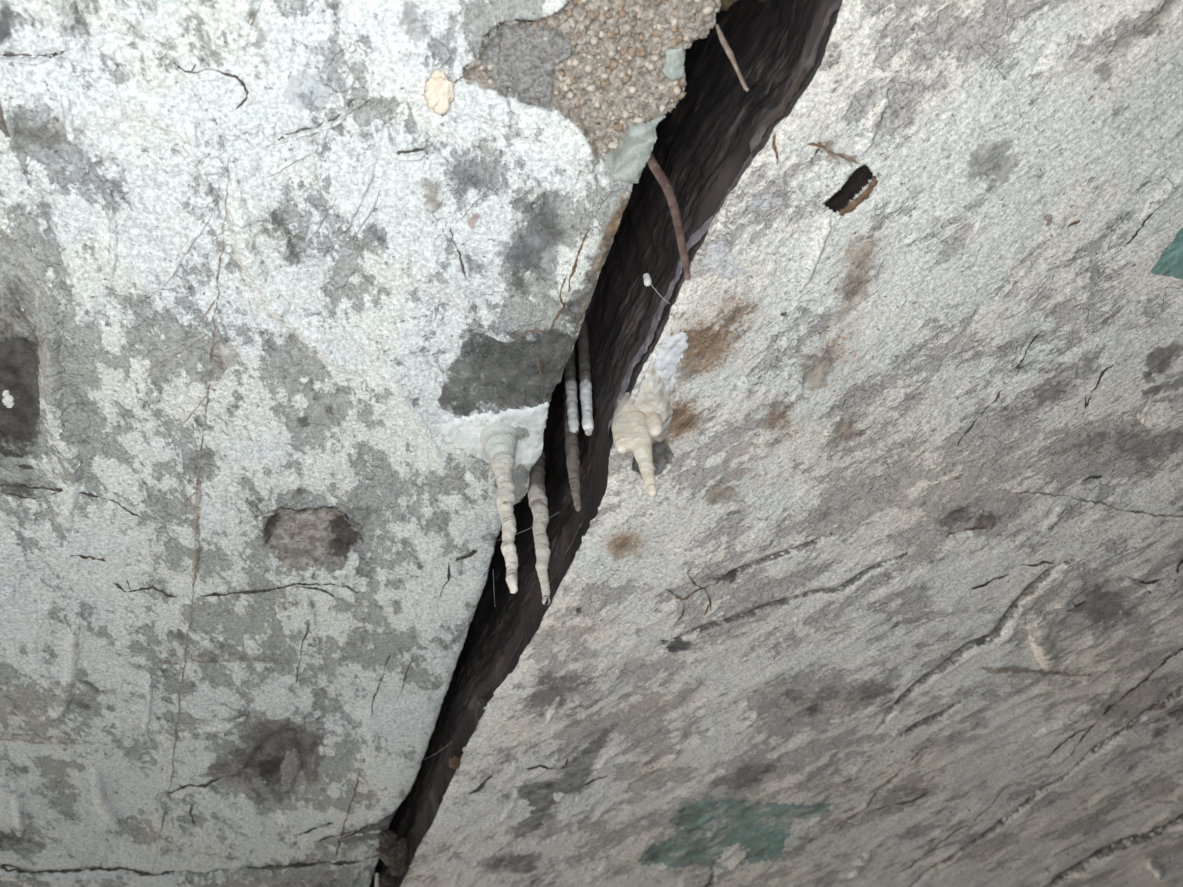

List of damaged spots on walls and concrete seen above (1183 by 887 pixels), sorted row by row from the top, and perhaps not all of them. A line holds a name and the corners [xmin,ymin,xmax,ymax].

spalling [463,0,721,183]
crack [771,133,779,164]
crack [807,142,859,164]
crack [450,228,467,280]
crack [518,226,590,386]
damp [438,251,608,505]
damp [634,332,688,444]
crack [0,158,379,886]
crack [434,550,477,606]
crack [664,575,725,627]
crack [971,560,1055,589]
crack [1046,648,1183,761]